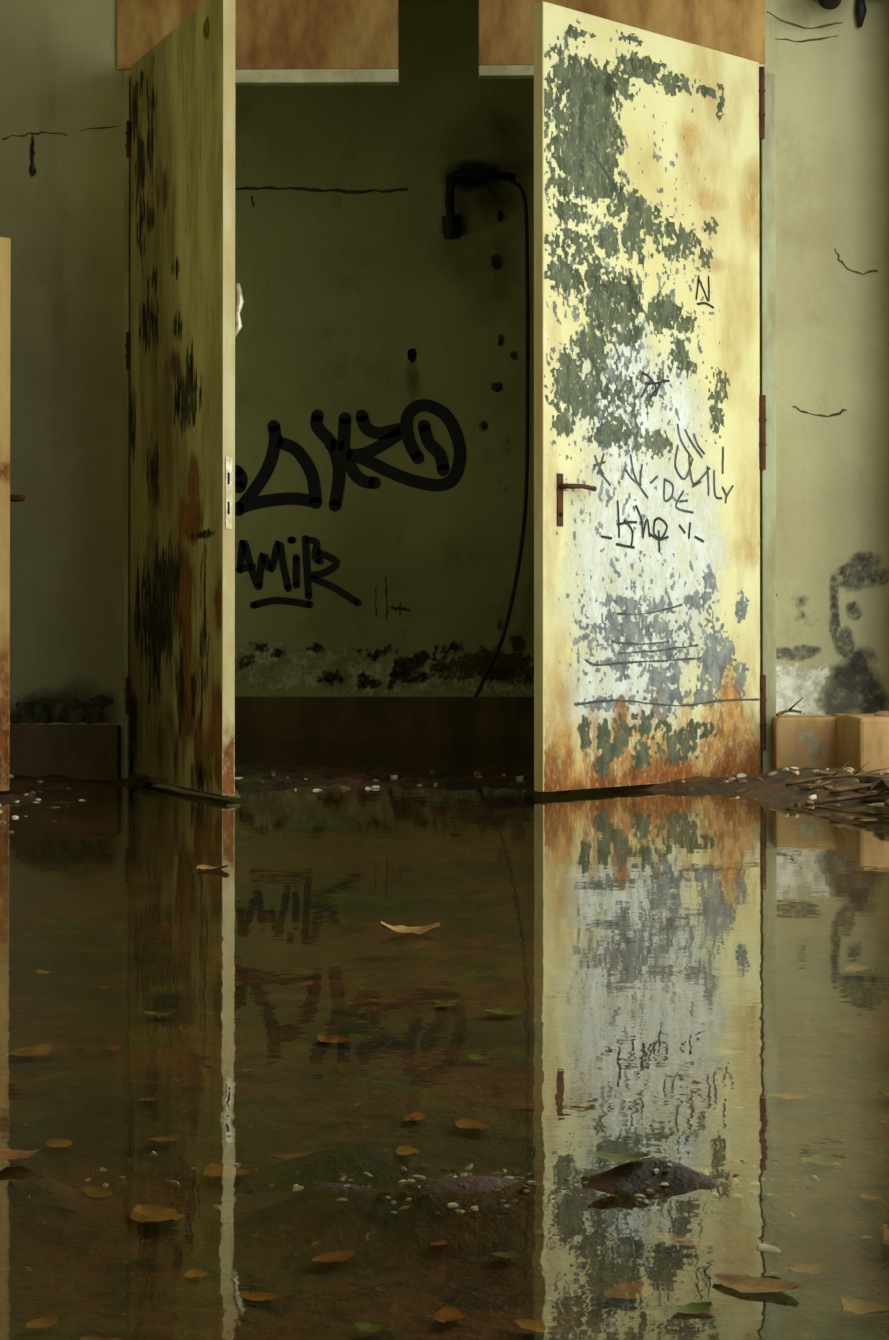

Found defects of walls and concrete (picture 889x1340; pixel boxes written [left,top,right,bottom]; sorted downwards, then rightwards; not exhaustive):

peeling [544,18,750,782]
corrosion [0,656,10,790]
corrosion [158,455,235,795]
corrosion [544,675,761,792]
water stain [776,645,819,660]
water stain [824,553,888,715]